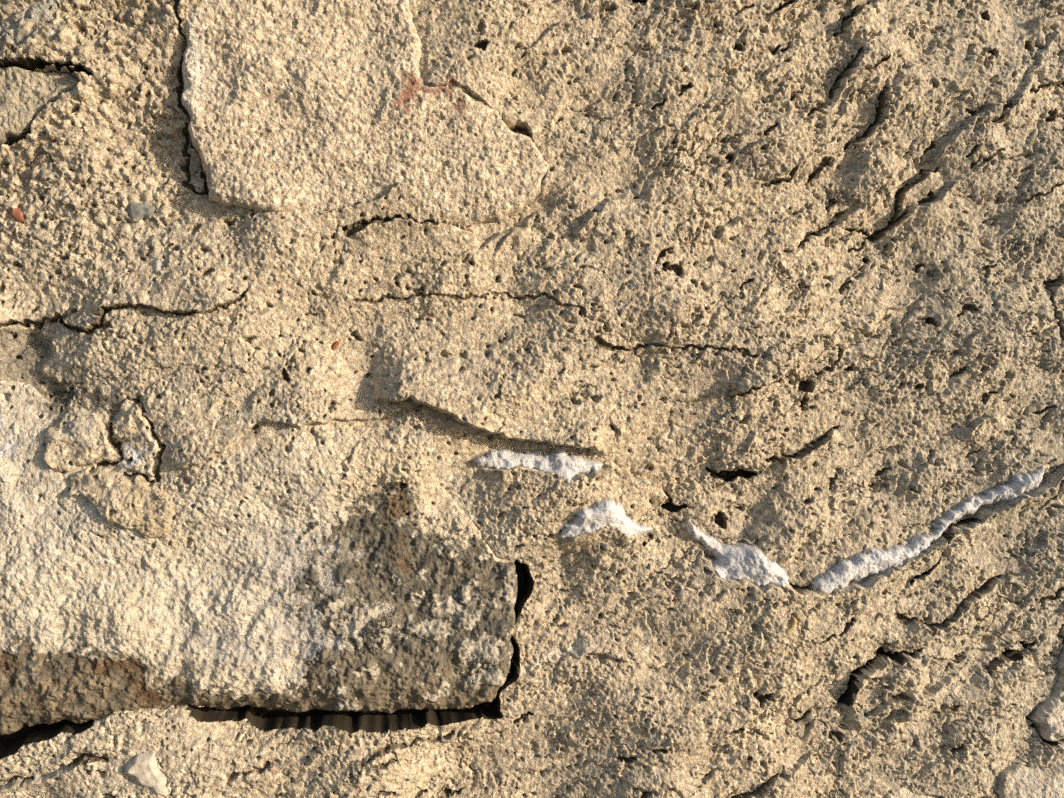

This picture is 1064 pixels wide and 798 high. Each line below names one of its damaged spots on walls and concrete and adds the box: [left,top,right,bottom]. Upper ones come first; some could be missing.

crack [172,0,209,195]
crack [761,1,891,188]
crack [965,80,1064,123]
crack [342,213,439,236]
crack [798,141,939,253]
crack [0,289,248,335]
crack [352,291,759,358]
crack [705,425,839,483]
crack [187,560,534,798]
crack [836,575,1001,716]
crack [950,587,1064,676]
crack [0,720,109,783]